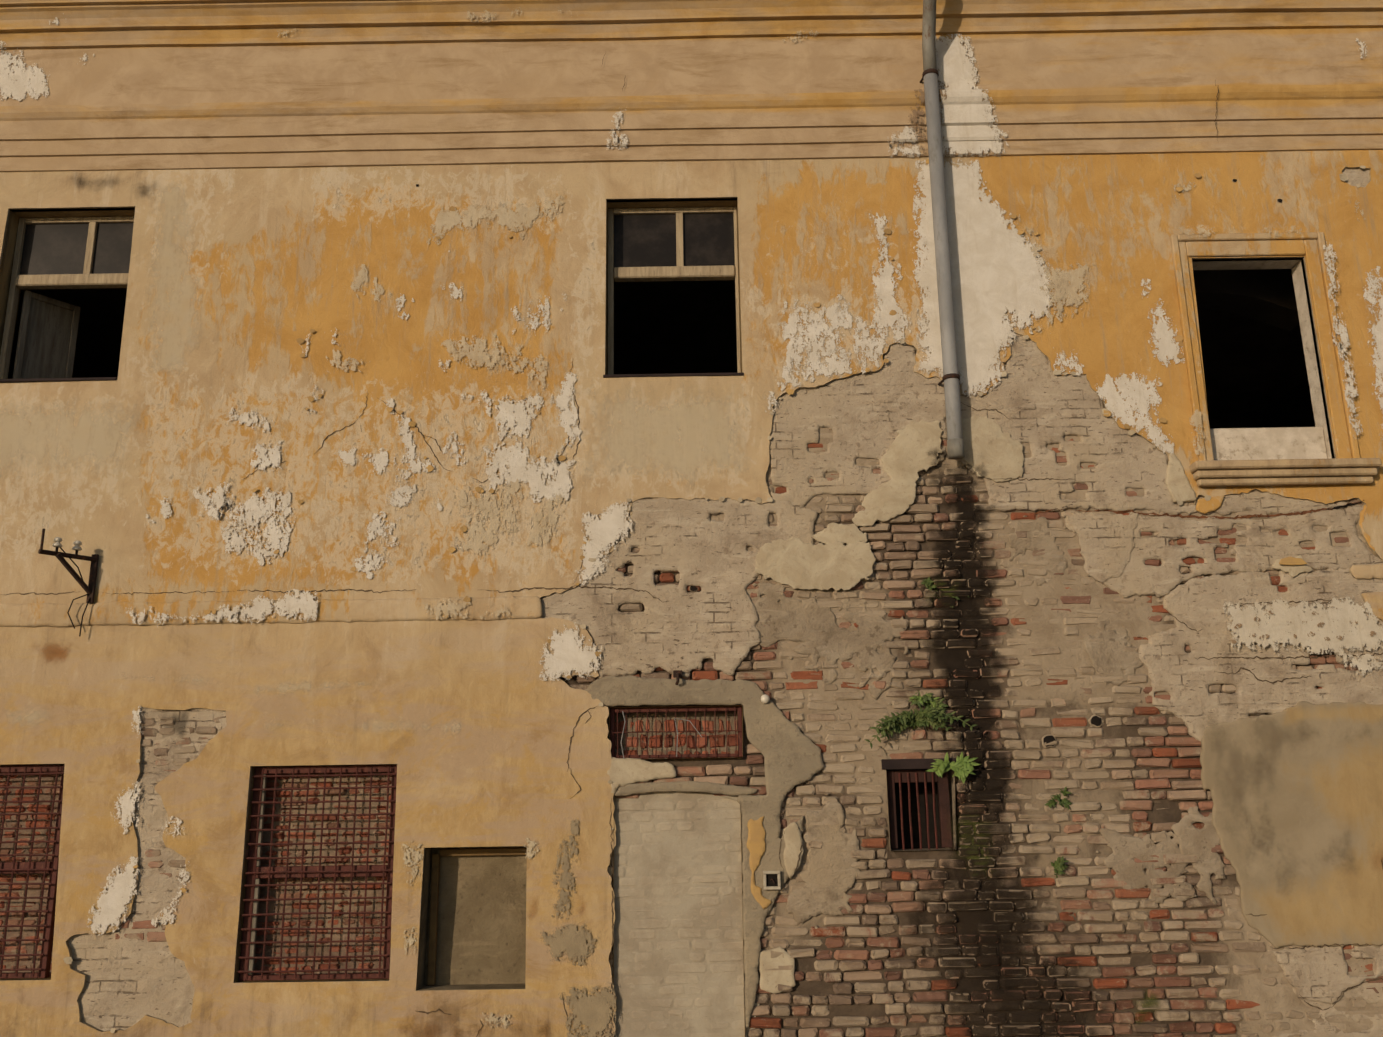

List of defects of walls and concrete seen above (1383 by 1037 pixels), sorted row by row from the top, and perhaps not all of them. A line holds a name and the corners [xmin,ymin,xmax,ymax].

peeling [0,40,49,101]
peeling [193,407,304,566]
peeling [296,329,363,373]
peeling [342,264,415,321]
peeling [334,398,468,579]
peeling [427,195,564,252]
peeling [437,292,582,557]
spalling [539,33,1383,1037]
water stain [914,472,1105,1037]
spalling [63,706,227,1033]
peeling [523,838,539,859]
crack [567,707,614,1033]